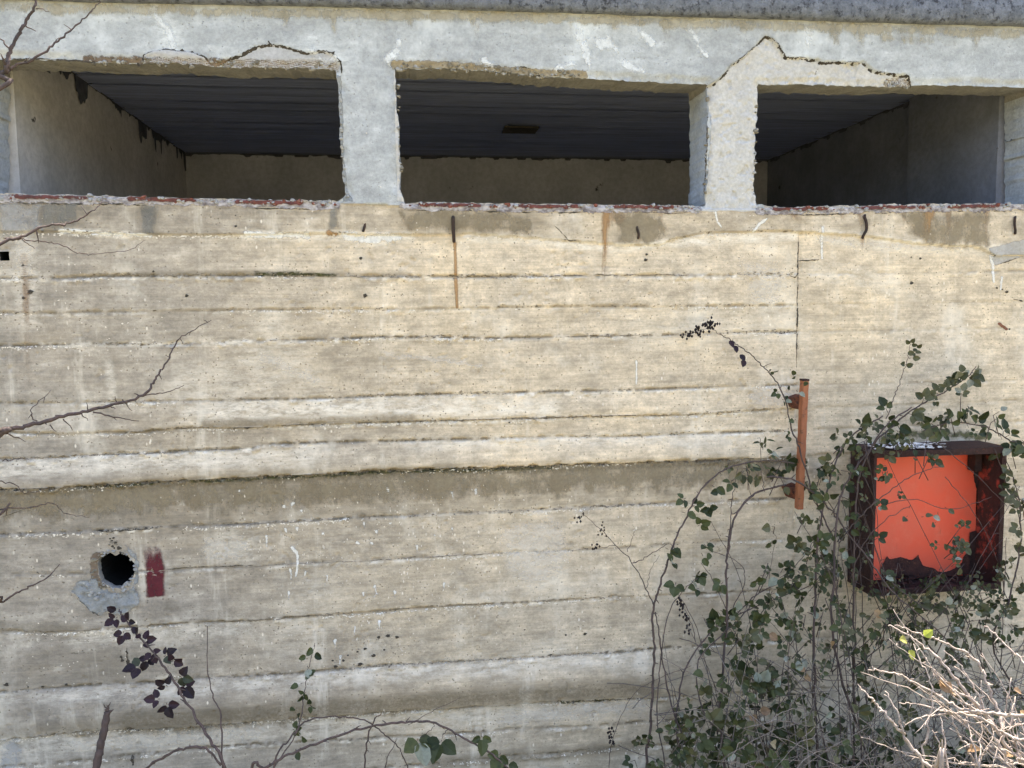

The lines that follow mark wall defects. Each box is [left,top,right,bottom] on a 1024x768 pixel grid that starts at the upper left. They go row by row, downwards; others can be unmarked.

peeling [83,45,352,234]
peeling [550,38,911,212]
damp [331,209,529,243]
rust [602,204,672,255]
damp [905,212,1003,290]
spalling [2,527,186,601]